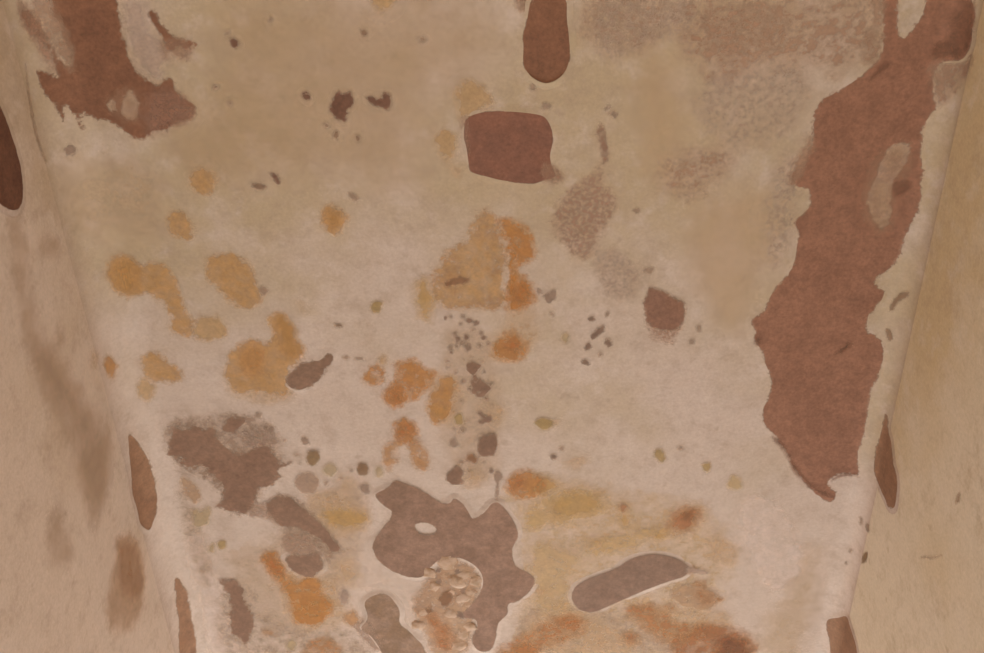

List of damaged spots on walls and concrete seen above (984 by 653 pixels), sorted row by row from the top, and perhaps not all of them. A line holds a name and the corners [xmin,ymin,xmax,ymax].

peeling [20,0,197,140]
peeling [516,0,577,90]
peeling [0,99,26,218]
peeling [457,103,562,190]
peeling [745,0,980,514]
peeling [643,287,686,342]
damp [182,478,210,527]
peeling [124,413,539,653]
corrosion [508,470,557,499]
corrosion [261,552,358,629]
peeling [567,550,707,615]